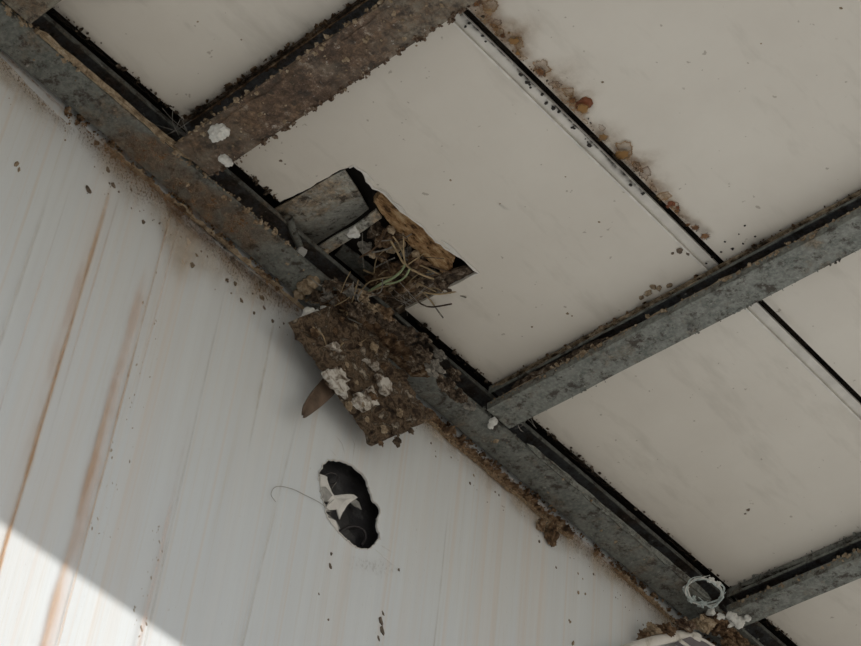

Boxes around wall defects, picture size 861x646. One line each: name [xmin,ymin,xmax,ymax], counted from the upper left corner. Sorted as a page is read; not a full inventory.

hole [349,165,480,318]